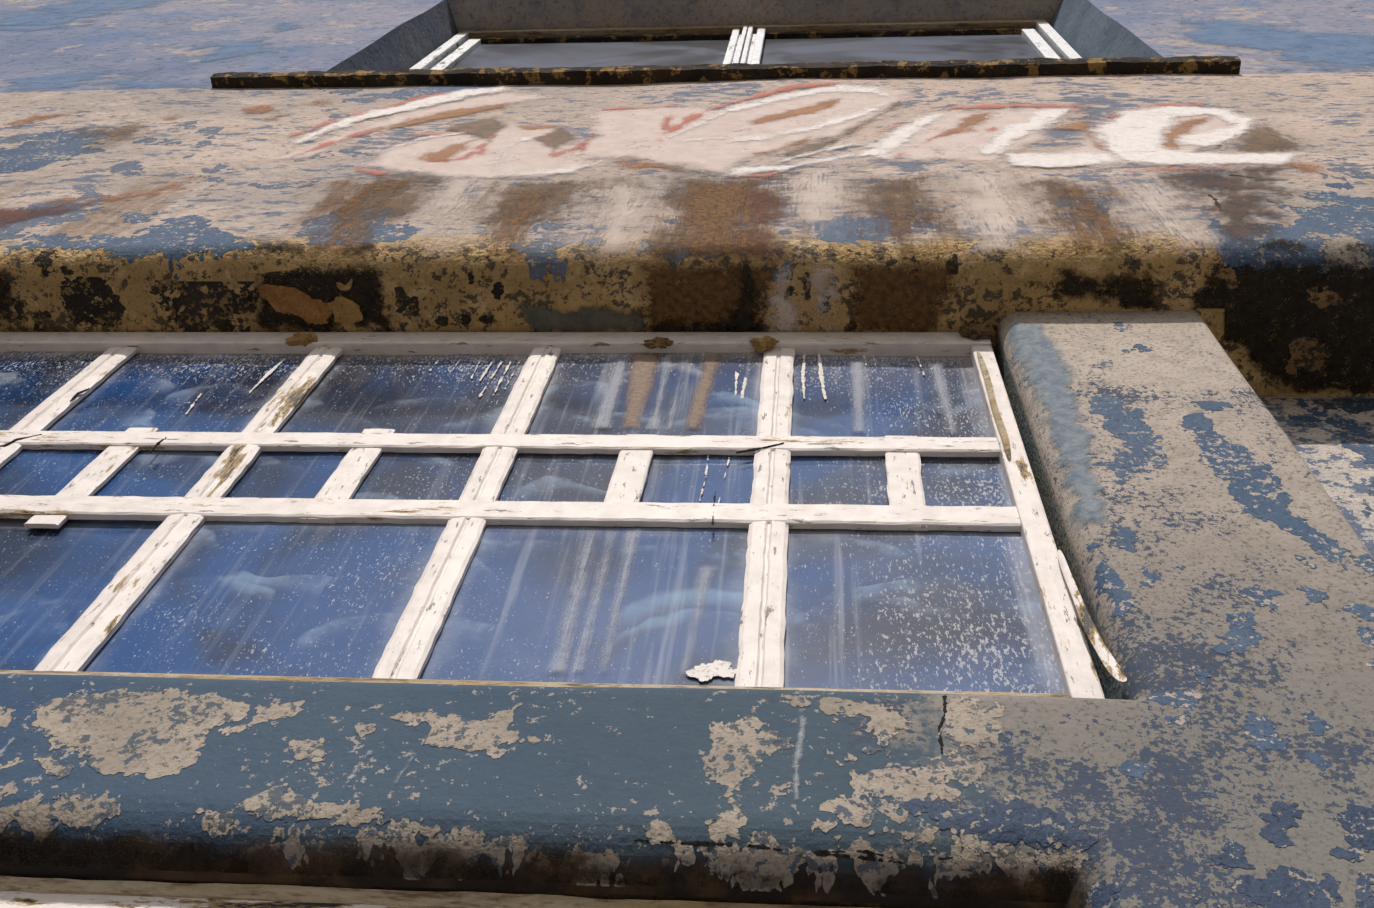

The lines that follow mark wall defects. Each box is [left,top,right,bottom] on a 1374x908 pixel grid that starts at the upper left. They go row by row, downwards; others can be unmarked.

mould [0,251,126,332]
leakage [149,242,494,332]
leakage [519,266,769,332]
mould [1042,268,1159,309]
leakage [1163,127,1374,394]
peeling [1181,398,1374,576]
peeling [0,687,305,843]
peeling [193,783,625,887]
peeling [355,703,541,759]
peeling [643,693,1122,908]
crack [938,695,947,754]
peeling [1191,801,1374,908]